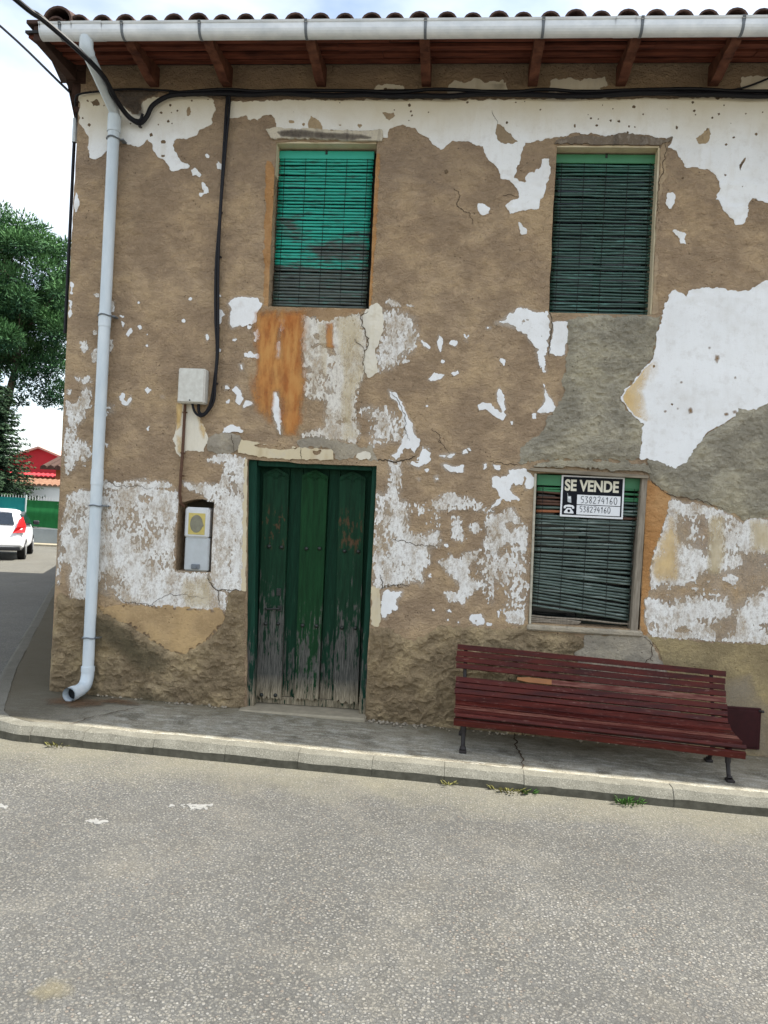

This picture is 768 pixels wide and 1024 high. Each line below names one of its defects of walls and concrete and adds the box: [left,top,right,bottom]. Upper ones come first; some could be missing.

corrosion [253,312,304,434]
peeling [49,75,768,756]
crack [446,733,524,768]